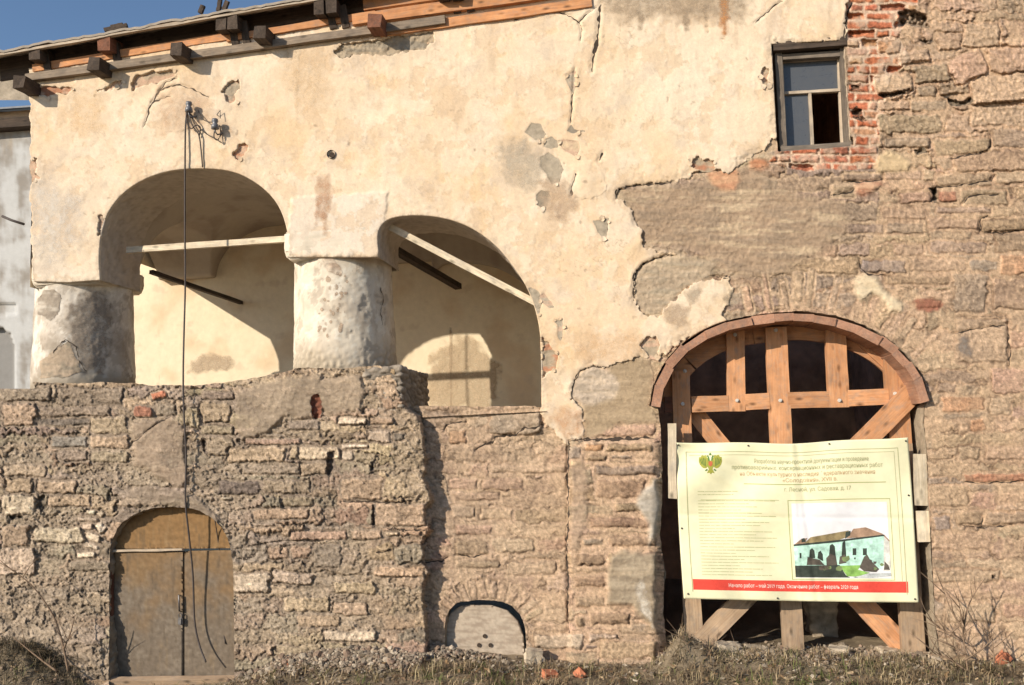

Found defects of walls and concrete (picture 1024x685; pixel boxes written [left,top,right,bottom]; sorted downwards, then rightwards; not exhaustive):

spalling [897,9,934,44]
spalling [334,31,434,58]
spalling [105,69,176,91]
spalling [222,78,240,104]
crack [559,5,601,123]
spalling [233,144,248,162]
spalling [525,123,585,212]
flaking render [688,156,766,191]
spalling [37,289,61,321]
leakage [192,355,231,372]
spalling [528,287,566,377]
spalling [640,336,661,360]